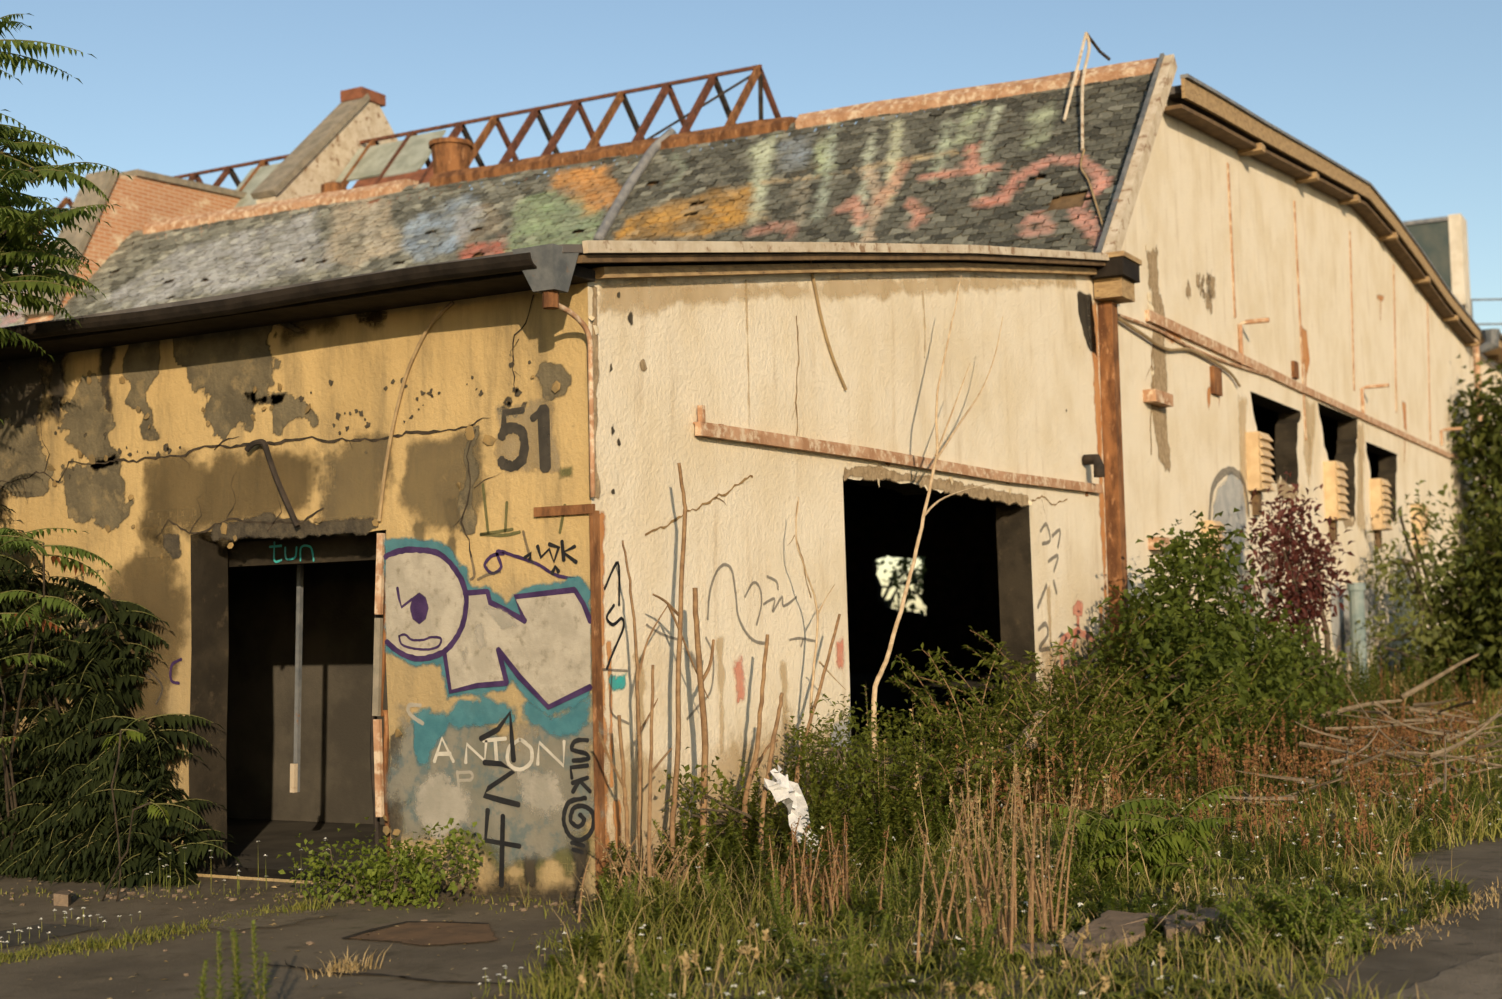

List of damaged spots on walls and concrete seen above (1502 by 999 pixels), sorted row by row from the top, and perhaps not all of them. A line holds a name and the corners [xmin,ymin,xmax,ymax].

rust [348,167,434,208]
flaking render [0,325,370,533]
crack [0,418,500,557]
spalling [384,377,441,423]
crack [510,295,534,394]
rust [1090,300,1102,459]
rust [1302,327,1310,386]
rust [1099,477,1110,672]